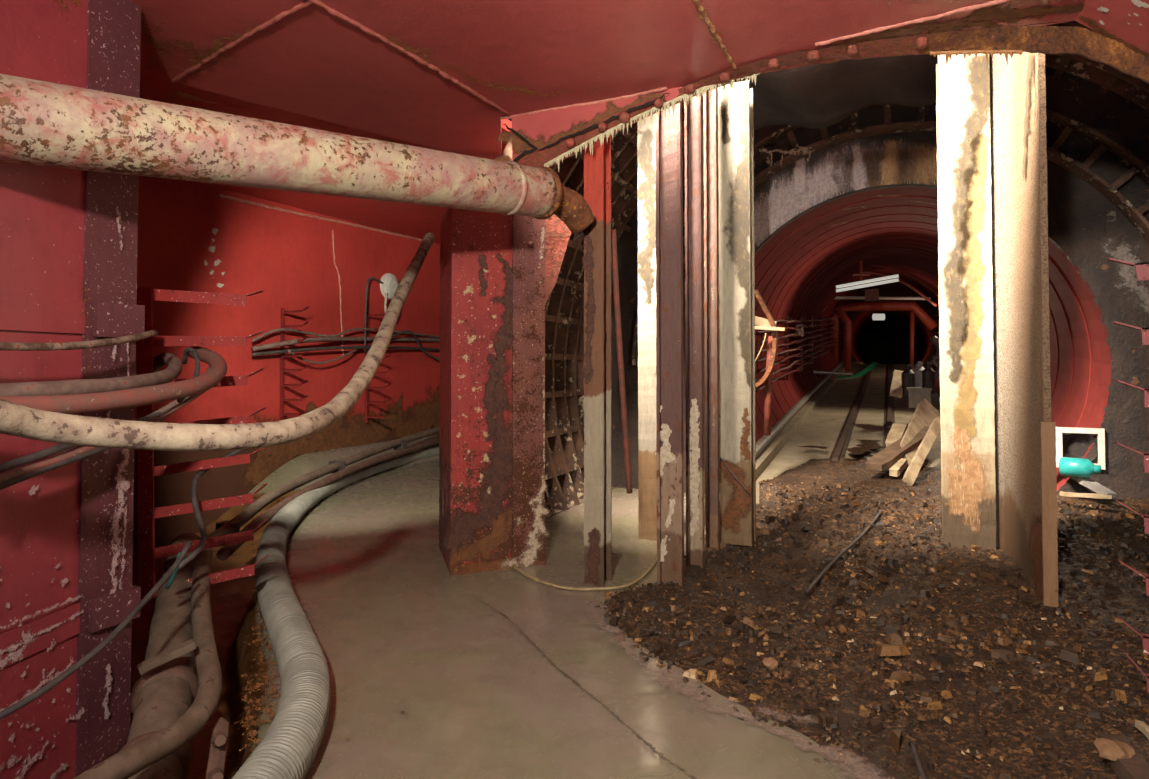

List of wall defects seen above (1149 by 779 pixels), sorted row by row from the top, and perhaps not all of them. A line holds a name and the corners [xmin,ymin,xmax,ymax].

rust [830,3,1149,58]
water stain [720,81,937,388]
water stain [943,54,990,382]
rust [947,54,999,547]
peeling [0,594,83,670]
peeling [102,664,113,721]
peeling [109,449,131,594]
rust [446,253,512,565]
crack [472,595,697,779]
peeling [655,405,676,476]
peeling [660,398,700,562]
rust [1029,516,1043,601]